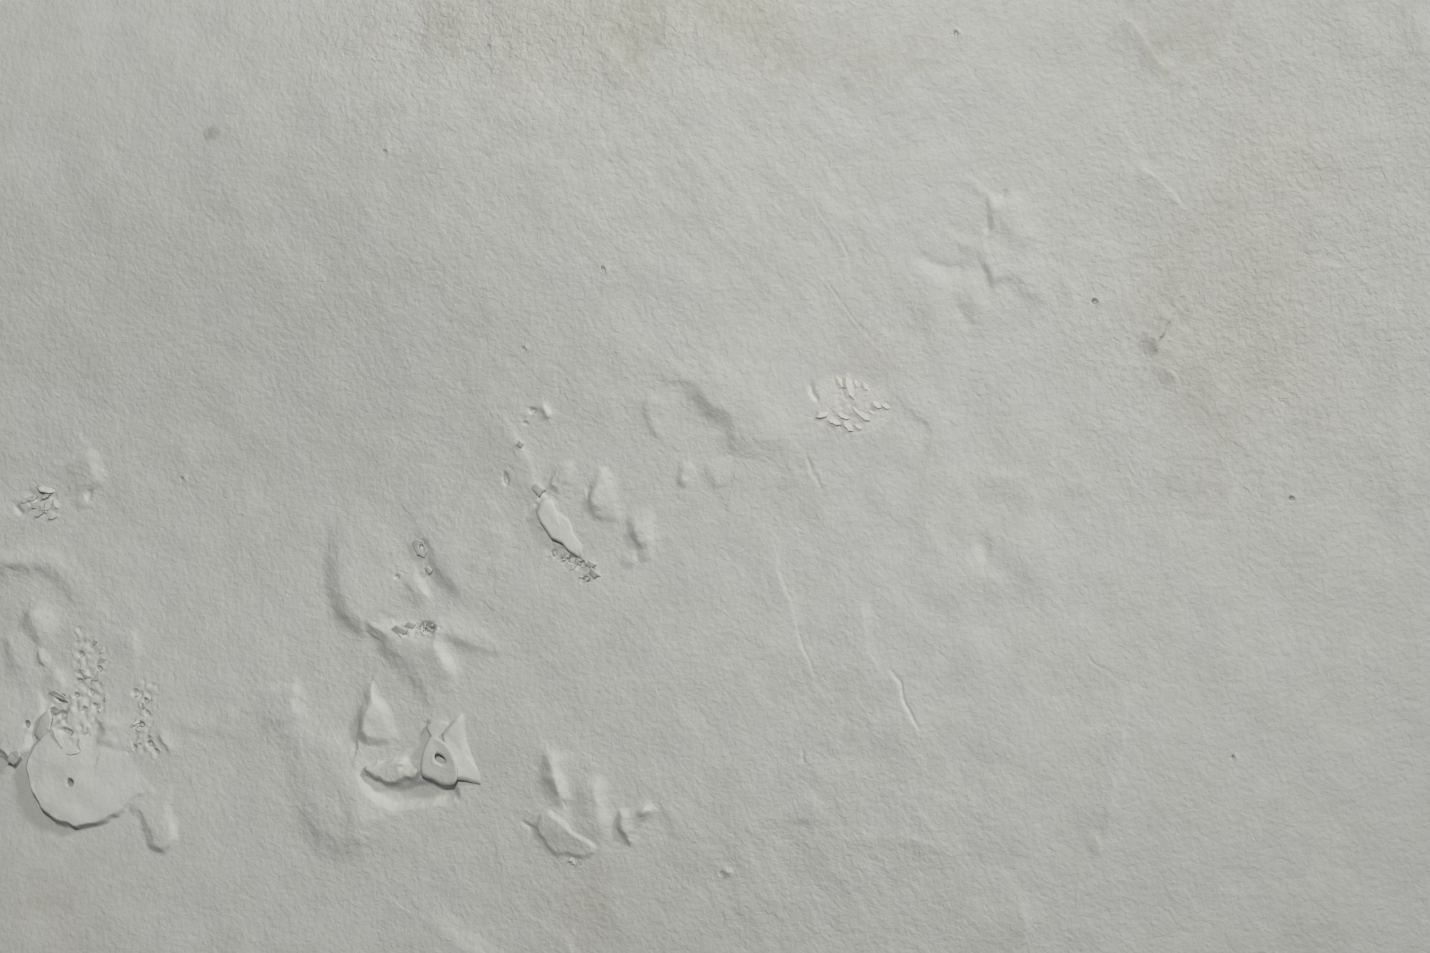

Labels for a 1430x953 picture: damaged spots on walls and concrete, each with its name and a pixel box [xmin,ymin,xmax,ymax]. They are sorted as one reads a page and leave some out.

spalling [14,486,60,520]
spalling [485,398,600,586]
spalling [34,639,179,760]
peeling [342,713,481,849]